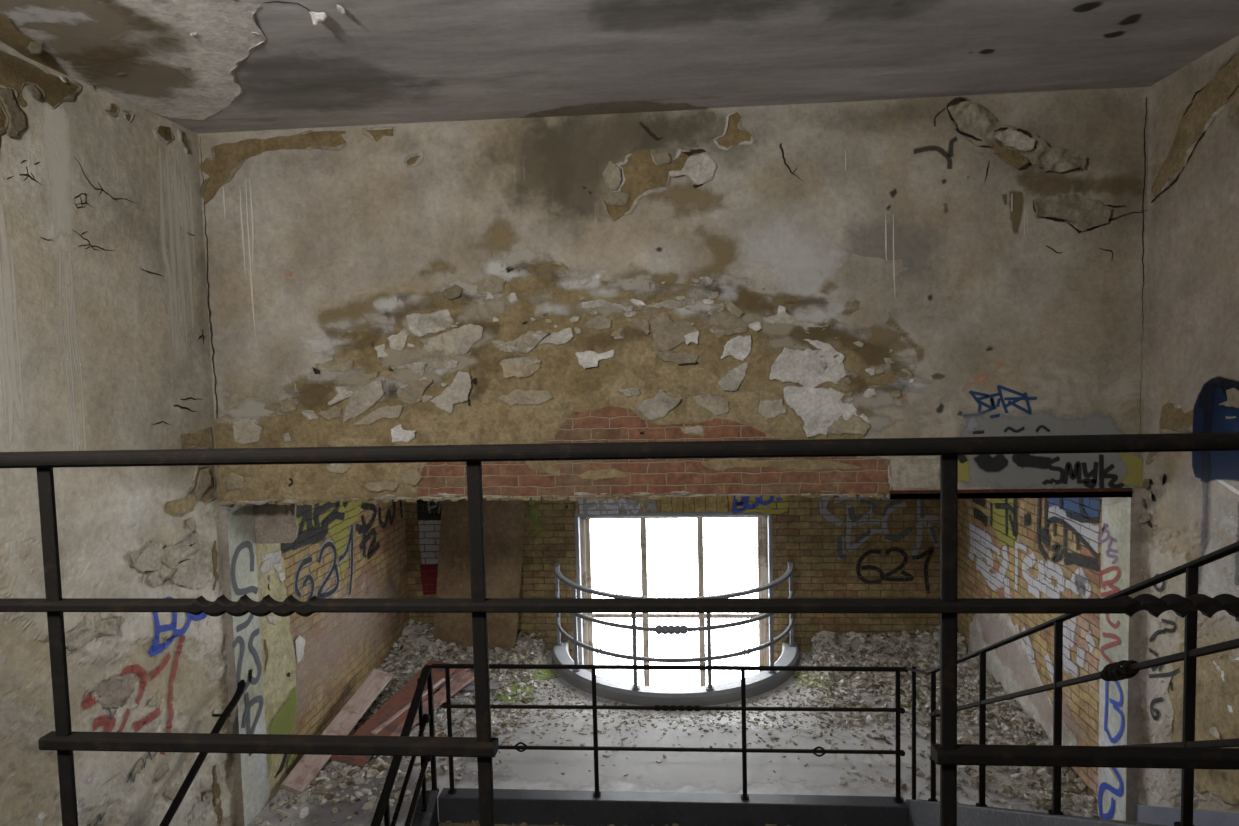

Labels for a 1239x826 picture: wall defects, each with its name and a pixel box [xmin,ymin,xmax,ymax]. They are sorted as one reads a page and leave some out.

damp [0,203,25,442]
damp [41,103,87,451]
peeling [0,0,347,204]
damp [159,146,196,363]
crack [187,137,218,418]
peeling [153,247,930,449]
damp [514,102,707,222]
peeling [582,111,755,222]
peeling [129,462,468,589]
flaking render [482,456,893,509]
peeling [1167,653,1239,748]
peeling [1194,769,1239,805]